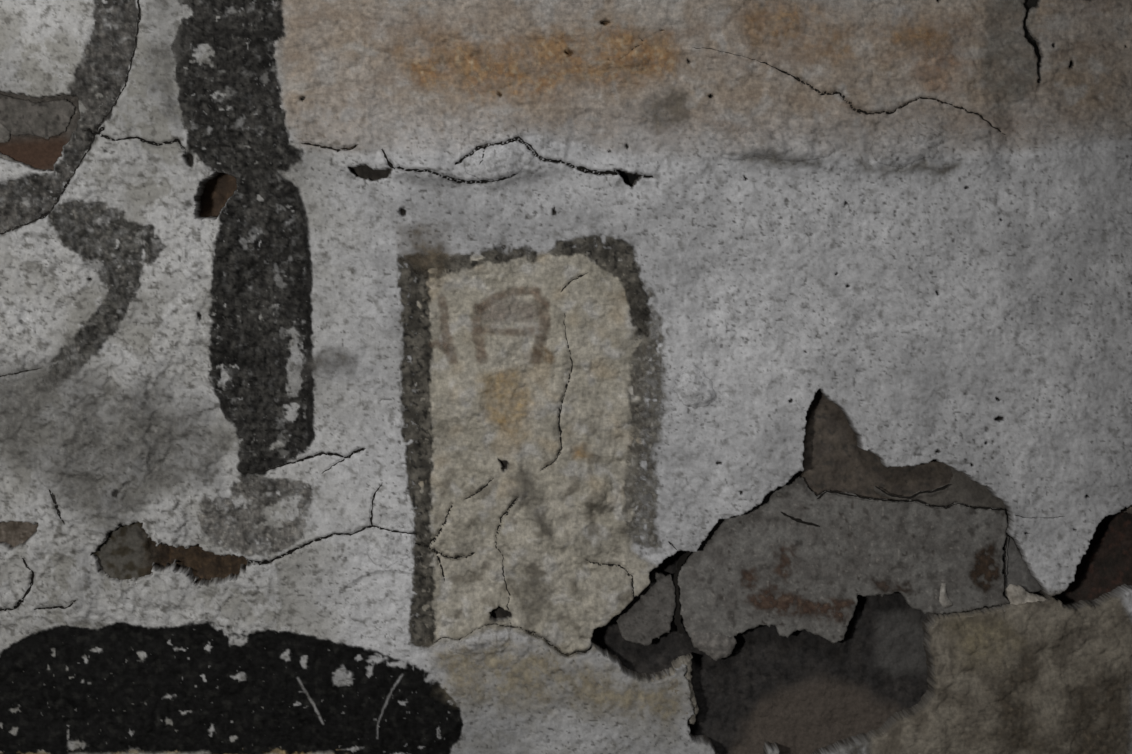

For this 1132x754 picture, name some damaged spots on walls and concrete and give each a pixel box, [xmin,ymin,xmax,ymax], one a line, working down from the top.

spalling [0,91,80,171]
crack [0,0,186,234]
crack [302,137,653,184]
crack [693,47,1006,135]
crack [540,275,583,471]
crack [245,448,365,474]
spalling [92,522,247,581]
crack [248,479,593,656]
crack [587,560,634,598]
spalling [592,390,1132,754]